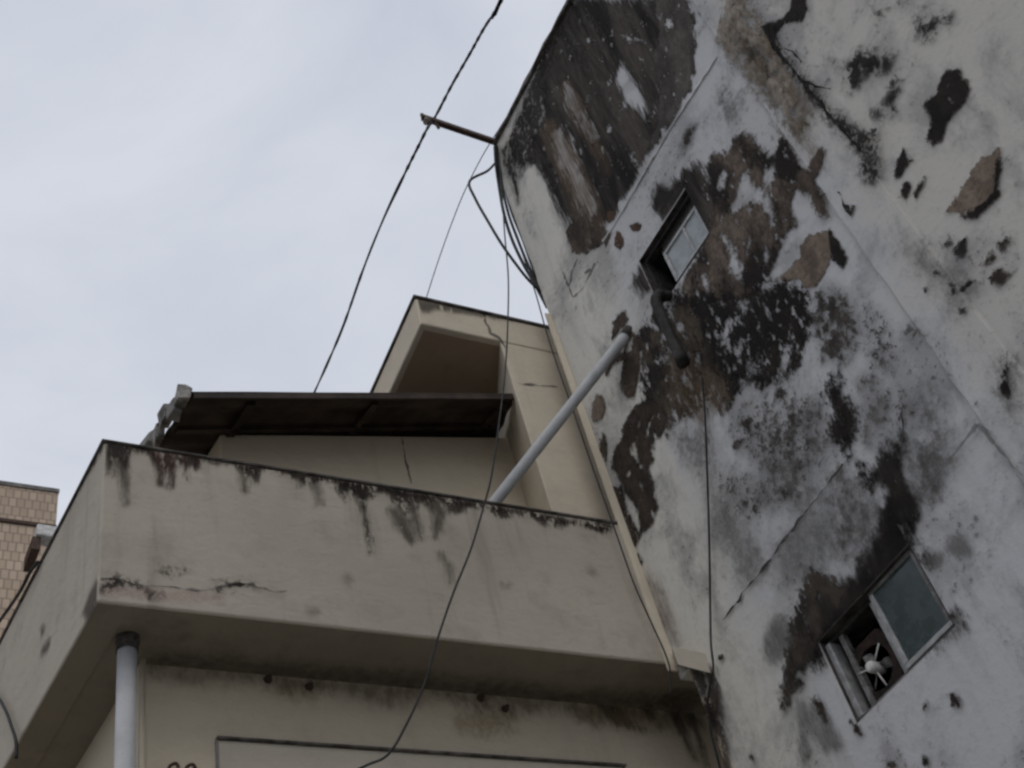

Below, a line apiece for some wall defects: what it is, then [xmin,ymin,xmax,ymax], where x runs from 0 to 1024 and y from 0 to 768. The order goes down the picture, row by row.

leakage [501,0,665,230]
leakage [651,161,716,259]
mould [683,126,695,149]
peeling [677,131,848,305]
peeling [945,147,1002,220]
leakage [629,267,651,295]
crack [483,313,506,348]
leakage [632,277,931,579]
leakage [80,443,611,552]
crack [101,577,287,592]